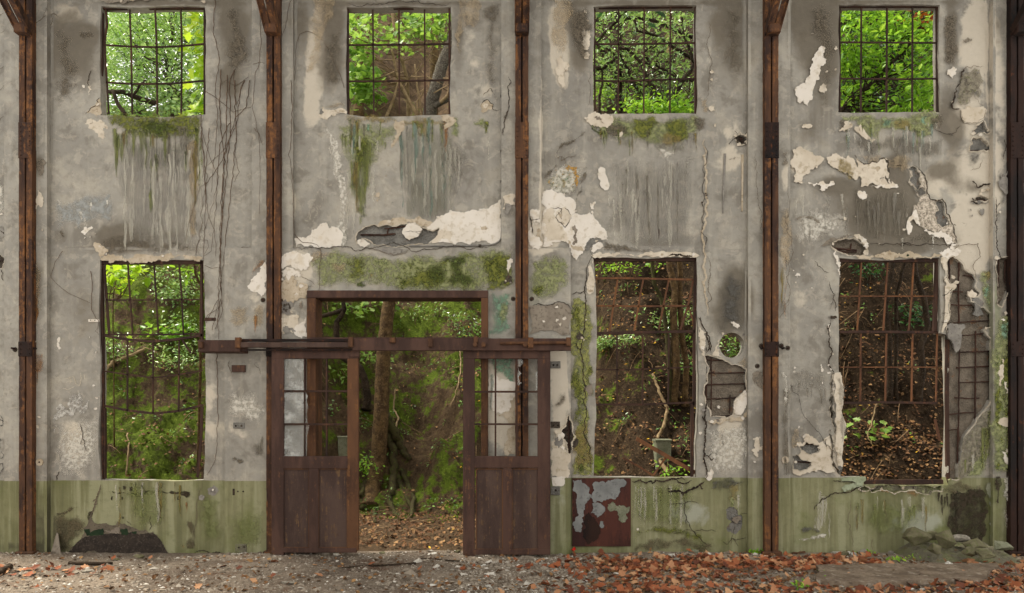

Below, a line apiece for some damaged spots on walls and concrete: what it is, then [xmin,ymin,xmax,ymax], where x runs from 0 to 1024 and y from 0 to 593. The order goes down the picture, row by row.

peeling [795,46,838,106]
leakage [113,128,202,183]
leakage [327,118,458,245]
leakage [104,237,184,253]
peeling [281,193,515,338]
peeling [528,189,699,294]
spalling [698,321,747,435]
crack [669,131,887,549]
spalling [790,146,1008,495]
rust [583,512,601,544]
crack [632,402,747,547]
leakage [909,460,1008,541]